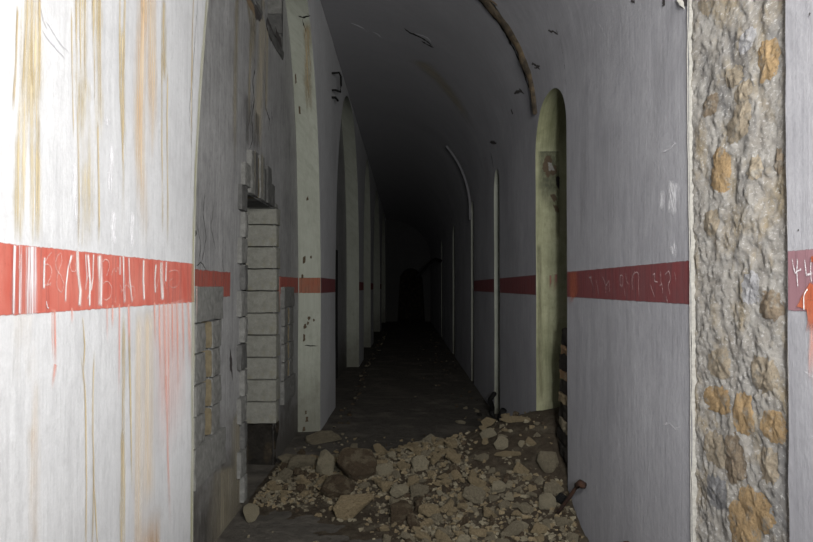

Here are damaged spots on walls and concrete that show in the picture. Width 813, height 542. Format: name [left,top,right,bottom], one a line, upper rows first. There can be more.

rust [137,0,155,174]
peeling [542,155,560,213]
peeling [660,183,676,211]
spalling [677,0,790,542]